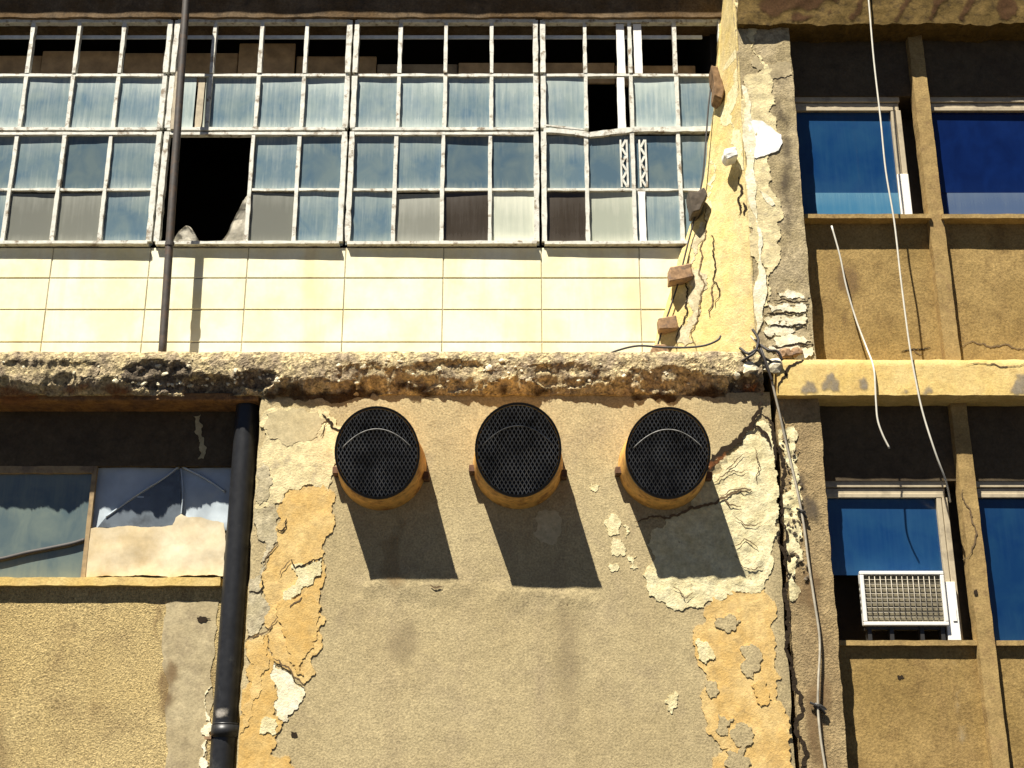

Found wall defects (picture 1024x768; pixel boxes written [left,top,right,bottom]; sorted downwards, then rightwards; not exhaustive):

crack [676,209,720,346]
flaking render [720,28,814,395]
spalling [0,355,100,388]
spalling [112,359,280,397]
flaking render [195,415,207,459]
spalling [325,358,707,396]
flaking render [237,406,342,768]
flaking render [604,420,809,768]
crack [635,359,809,768]
flaking render [199,686,212,768]